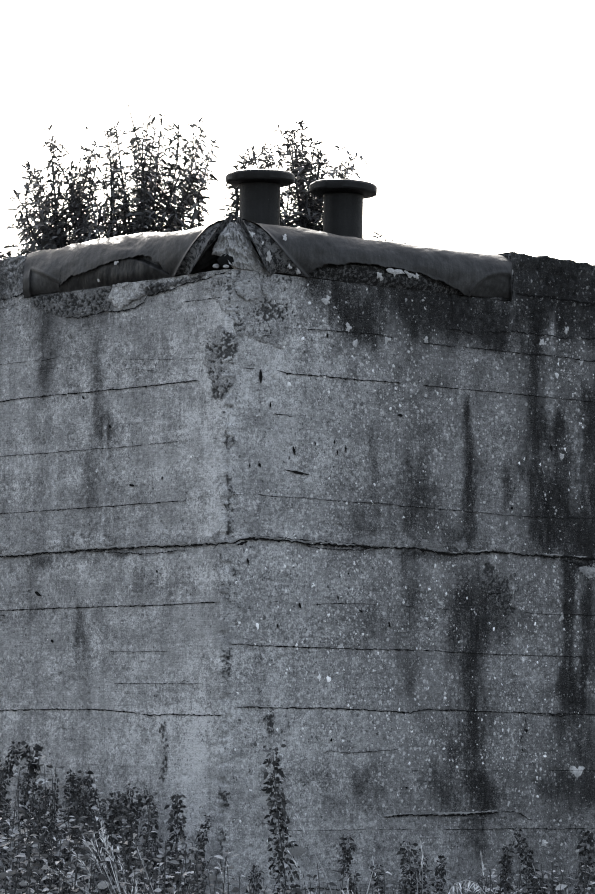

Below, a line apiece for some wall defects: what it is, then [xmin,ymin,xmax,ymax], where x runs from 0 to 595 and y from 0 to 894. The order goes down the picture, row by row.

spalling [30,221,302,702]
crack [0,535,595,568]
water stain [305,255,595,803]
water stain [448,570,509,851]